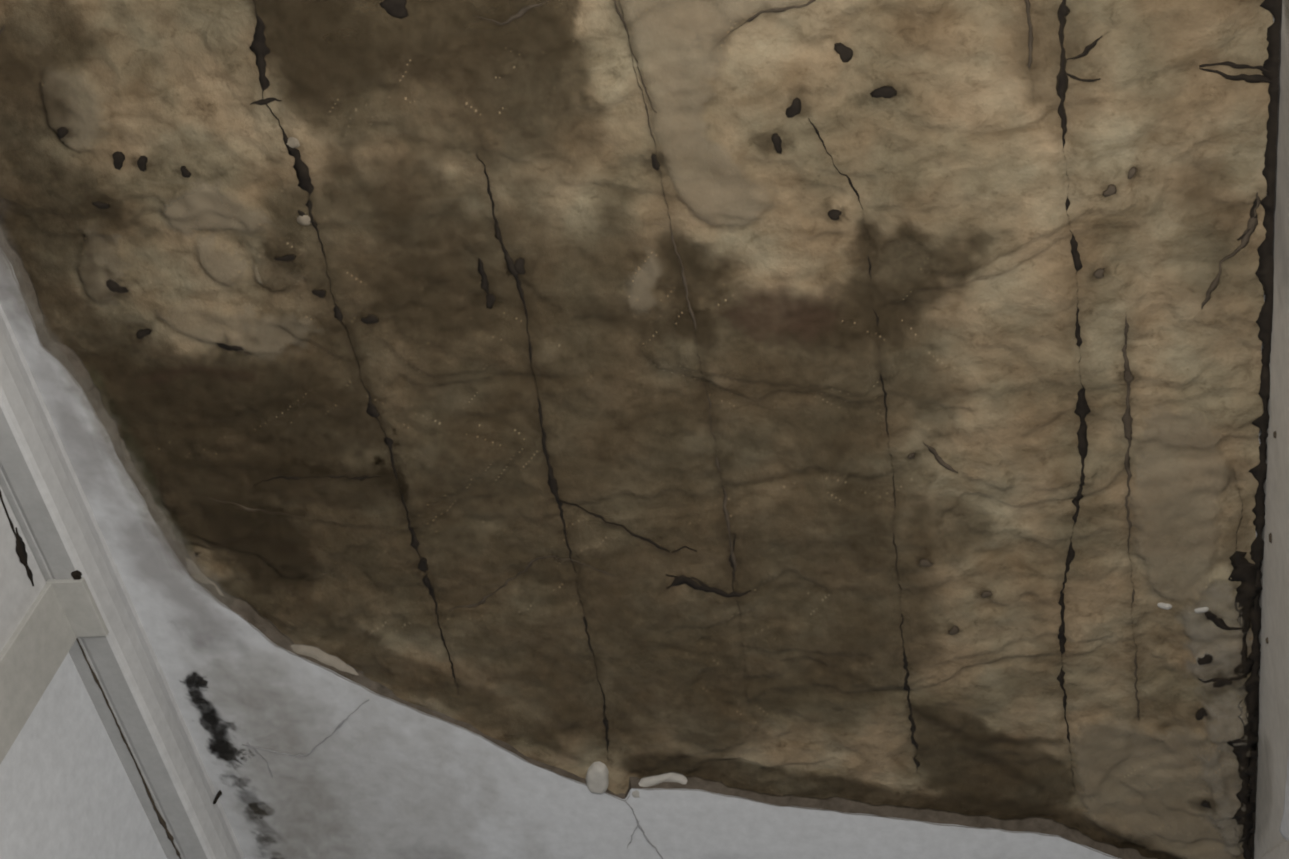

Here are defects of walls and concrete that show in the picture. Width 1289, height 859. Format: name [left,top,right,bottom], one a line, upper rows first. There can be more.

water stain [0,56,100,272]
crack [207,0,459,695]
water stain [254,0,584,109]
water stain [29,191,1178,859]
crack [473,0,751,760]
spalling [785,98,802,118]
spalling [834,42,853,62]
crack [1024,0,1102,787]
crack [1122,318,1140,719]
crack [1199,0,1282,859]
spalling [1078,750,1099,780]
spalling [1082,788,1122,829]